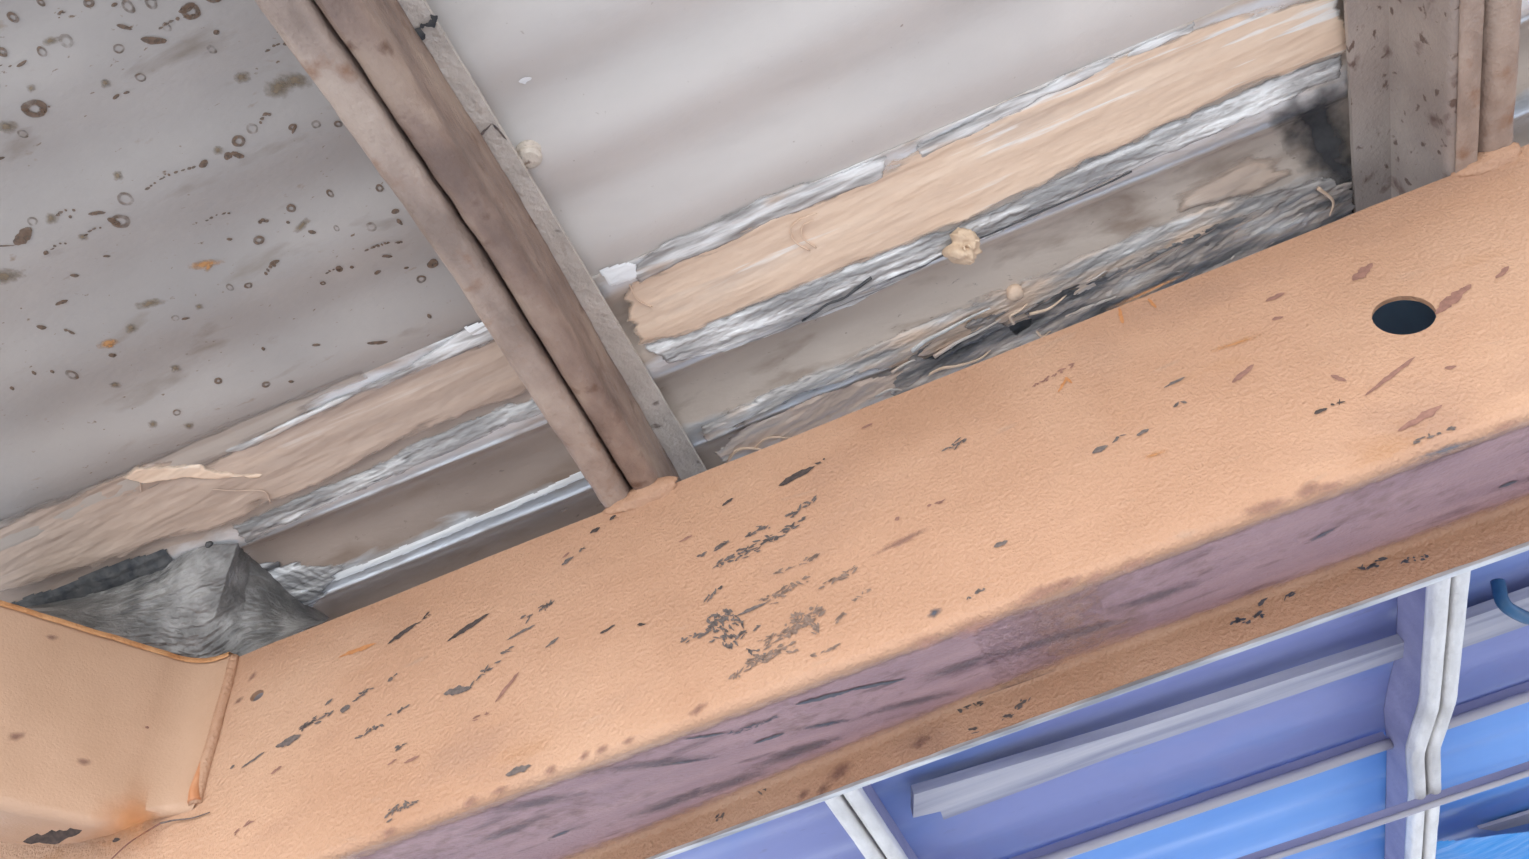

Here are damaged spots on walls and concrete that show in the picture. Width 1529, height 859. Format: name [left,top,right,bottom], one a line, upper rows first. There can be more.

corrosion [83,0,221,53]
corrosion [1,86,50,138]
corrosion [145,135,245,190]
corrosion [0,173,129,255]
corrosion [253,204,316,245]
corrosion [365,209,438,283]
peeling [696,495,817,568]
peeling [388,612,431,644]
peeling [444,600,555,695]
peeling [680,553,871,679]
peeling [1230,592,1295,625]
peeling [230,673,397,769]